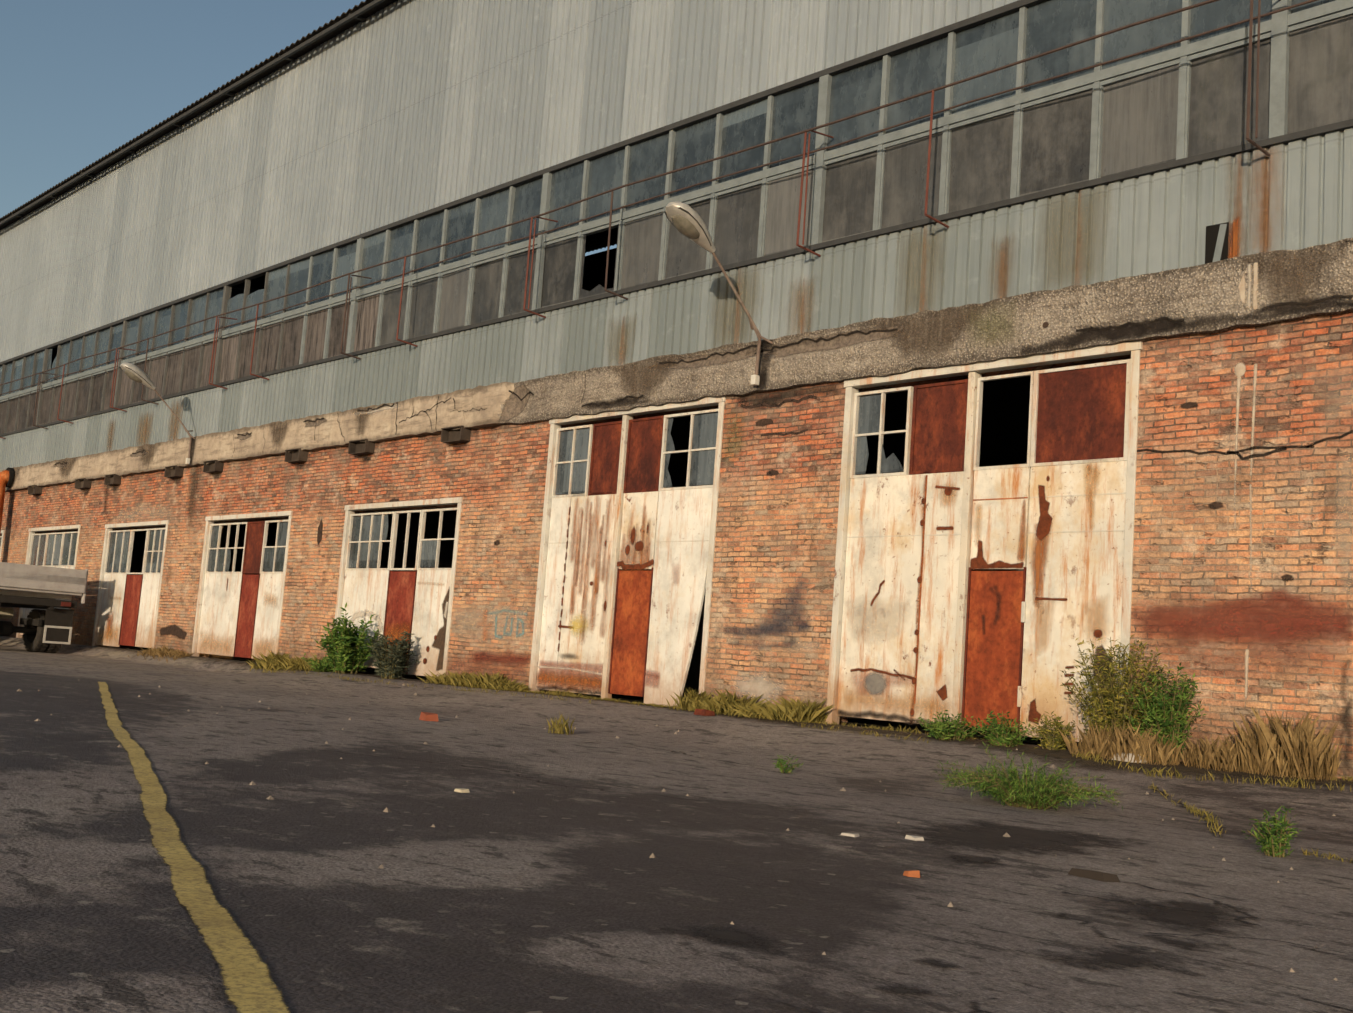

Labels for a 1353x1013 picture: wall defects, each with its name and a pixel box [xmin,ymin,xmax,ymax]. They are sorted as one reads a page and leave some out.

rust [1228,218,1239,258]
leakage [882,307,978,350]
crack [1137,430,1353,460]
rust [970,476,1067,603]
rust [558,507,654,651]
rust [838,477,960,725]
rust [1028,699,1041,724]